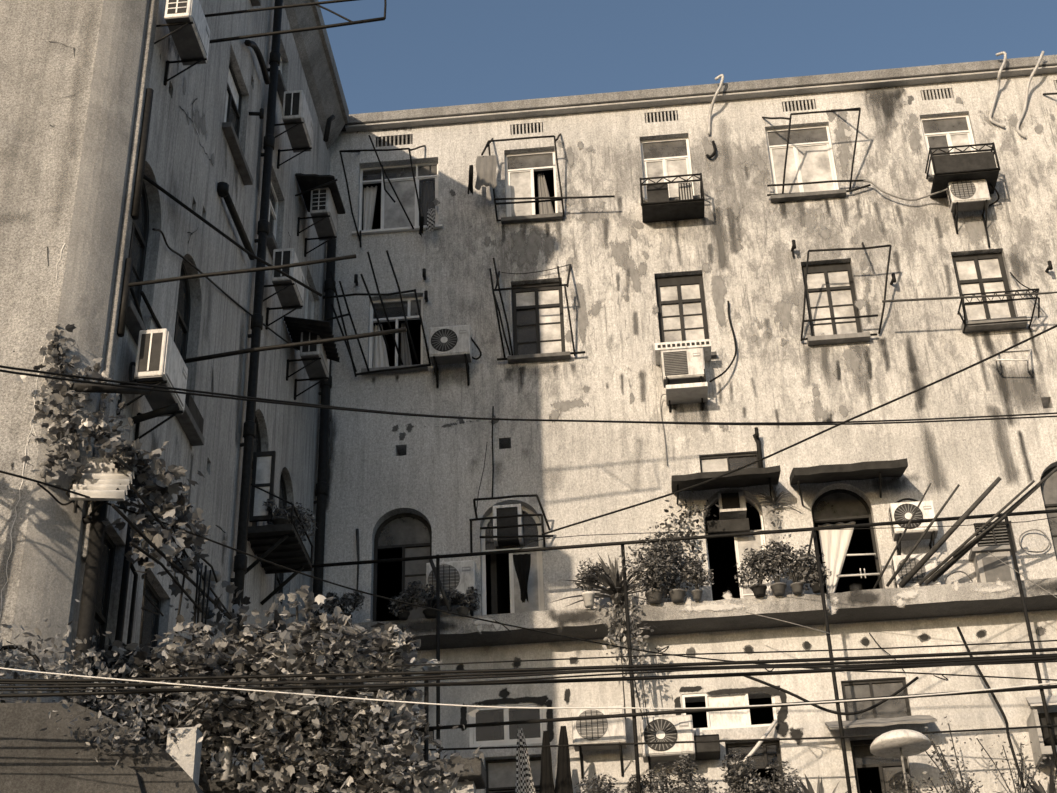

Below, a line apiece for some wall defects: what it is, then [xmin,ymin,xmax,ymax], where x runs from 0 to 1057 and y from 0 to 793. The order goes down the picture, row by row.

damp [866,93,900,126]
damp [703,208,741,269]
damp [780,202,804,216]
damp [825,197,861,220]
damp [1009,255,1025,280]
damp [1011,327,1038,358]
damp [907,340,924,409]
damp [973,332,1042,482]
crack [0,346,45,615]
damp [925,430,944,489]